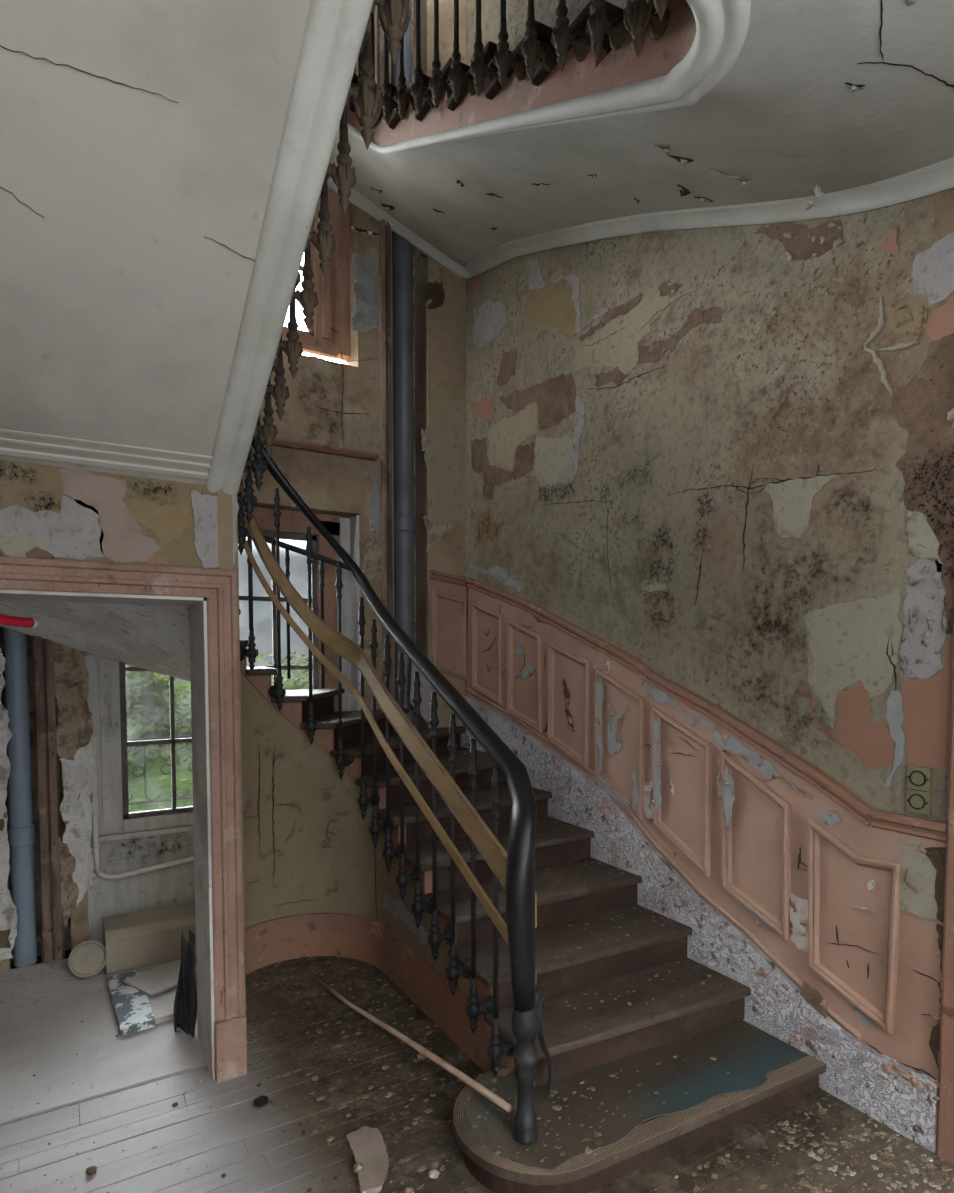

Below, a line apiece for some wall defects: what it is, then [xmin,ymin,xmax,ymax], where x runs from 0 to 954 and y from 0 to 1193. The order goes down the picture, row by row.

crack [0,45,179,103]
crack [857,0,954,88]
peeling [421,258,722,552]
peeling [191,490,219,569]
crack [695,555,703,605]
crack [668,464,884,570]
damp [736,553,849,654]
peeling [764,475,839,538]
spalling [799,232,954,787]
peeling [54,642,96,928]
crack [830,925,879,979]
peeling [877,839,952,1101]